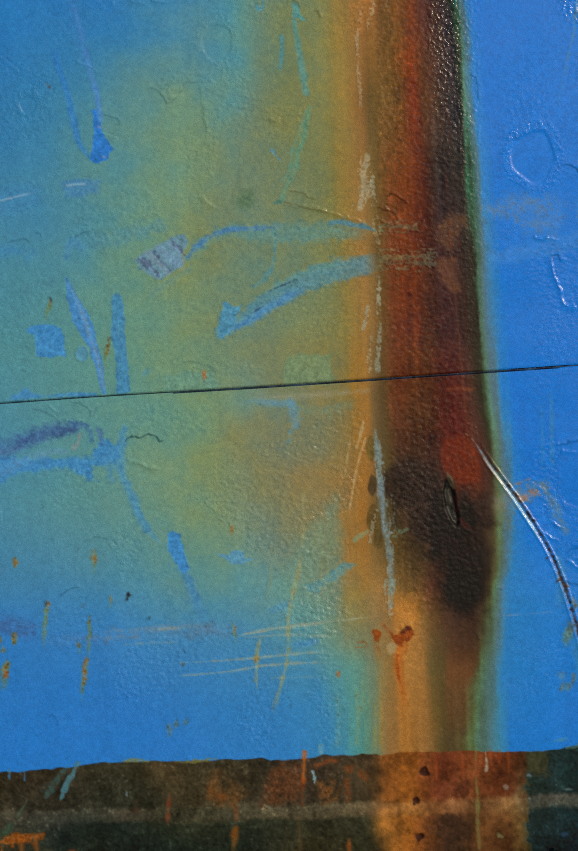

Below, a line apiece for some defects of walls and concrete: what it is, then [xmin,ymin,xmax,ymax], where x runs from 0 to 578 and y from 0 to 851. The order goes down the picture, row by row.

rust [465,386,474,472]
rust [467,369,551,485]
rust [475,456,501,496]
rust [527,496,578,583]
rust [0,657,12,693]
rust [346,664,386,751]
rust [370,627,385,665]
rust [388,624,415,712]
rust [475,510,578,751]
rust [0,821,55,851]
rust [258,758,302,810]
rust [312,748,552,851]